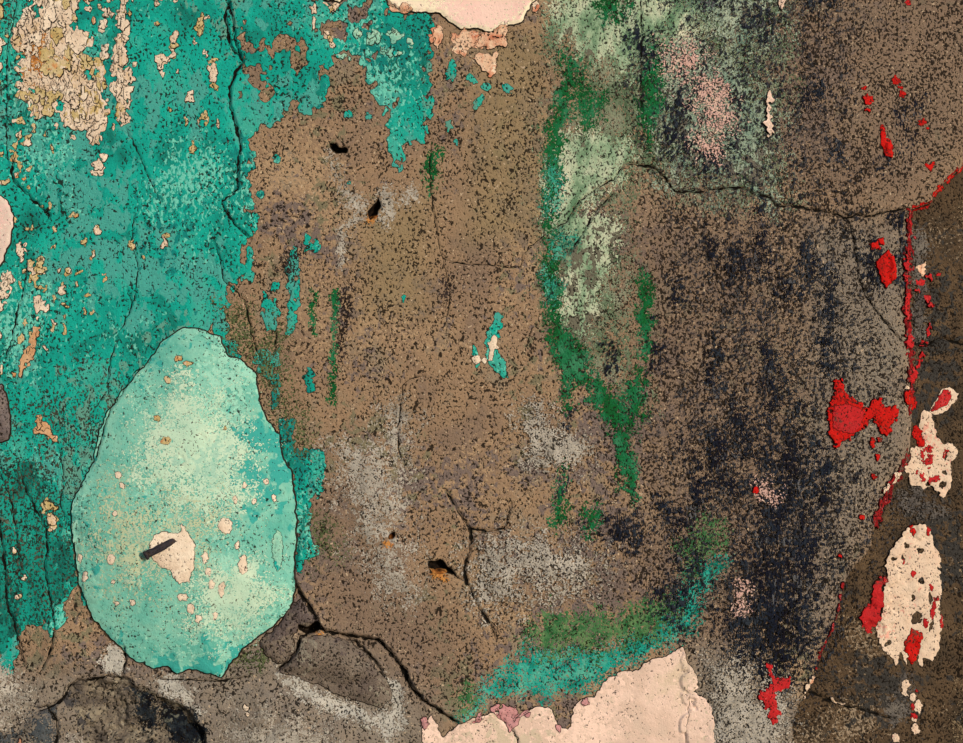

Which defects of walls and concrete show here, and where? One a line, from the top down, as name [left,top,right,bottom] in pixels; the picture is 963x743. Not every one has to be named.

crack [221,0,250,239]
peeling [761,90,775,138]
peeling [861,86,874,112]
peeling [879,124,894,158]
crack [215,244,277,361]
peeling [0,0,540,677]
crack [429,147,963,346]
peeling [792,166,963,743]
crack [447,493,511,636]
crack [37,648,127,743]
crack [277,585,456,722]
peeling [757,662,791,725]